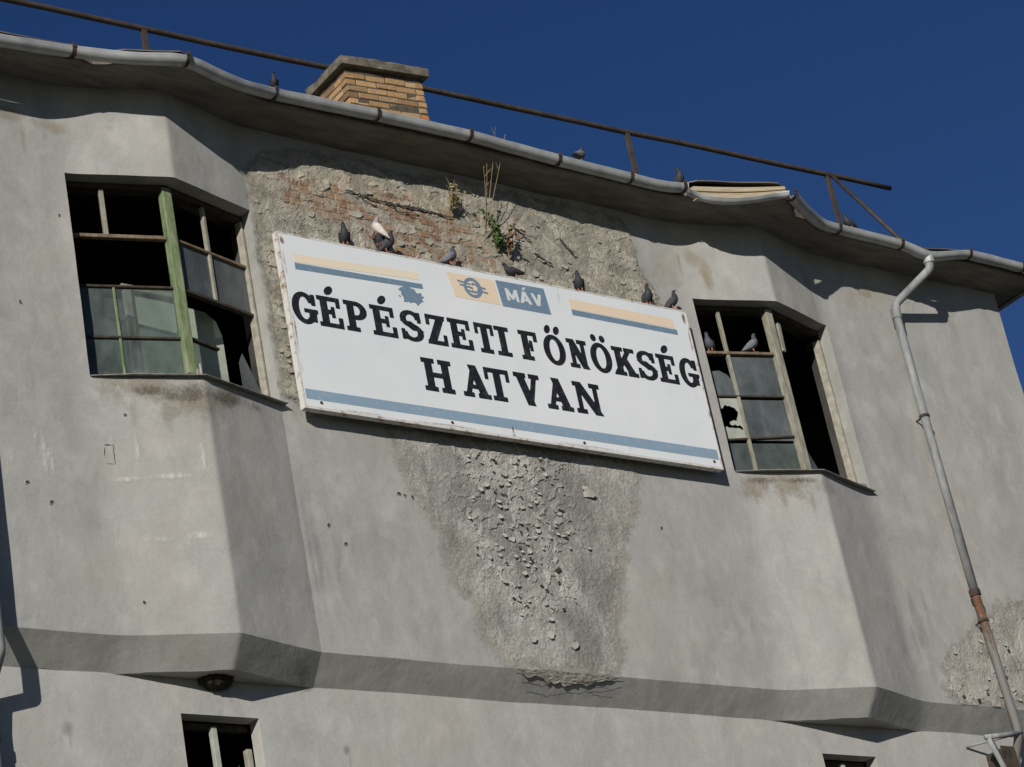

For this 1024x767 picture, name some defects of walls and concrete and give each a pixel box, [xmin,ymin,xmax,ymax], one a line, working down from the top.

peeling [245,149,663,402]
peeling [387,424,639,687]
crack [521,675,618,689]
spalling [942,598,1024,707]